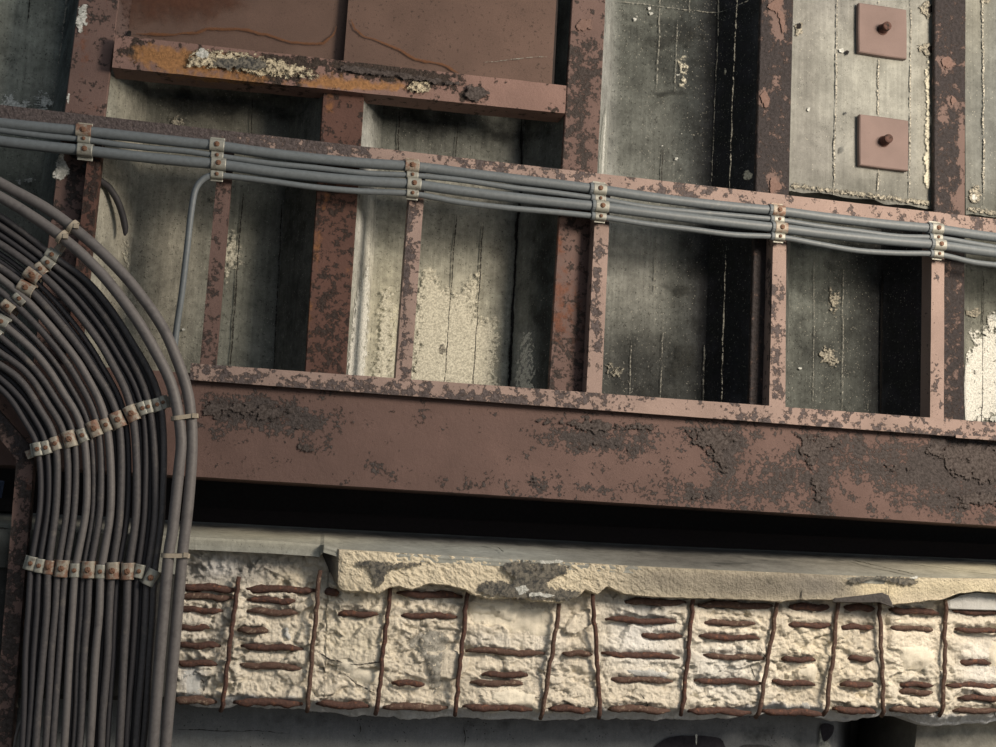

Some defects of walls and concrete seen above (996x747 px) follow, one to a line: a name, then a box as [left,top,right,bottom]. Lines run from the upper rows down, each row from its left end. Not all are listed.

rust [129,0,556,84]
leakage [1,90,54,110]
leakage [599,109,608,174]
leakage [964,312,996,422]
peeling [926,442,996,485]
spalling [175,549,996,747]
leakage [655,734,725,747]